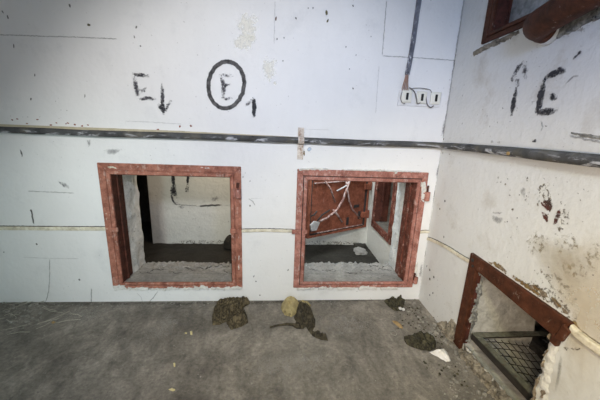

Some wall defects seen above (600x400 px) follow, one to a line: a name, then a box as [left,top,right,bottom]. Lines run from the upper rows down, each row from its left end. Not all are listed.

spalling [437,272,513,400]
flaking render [530,333,559,400]